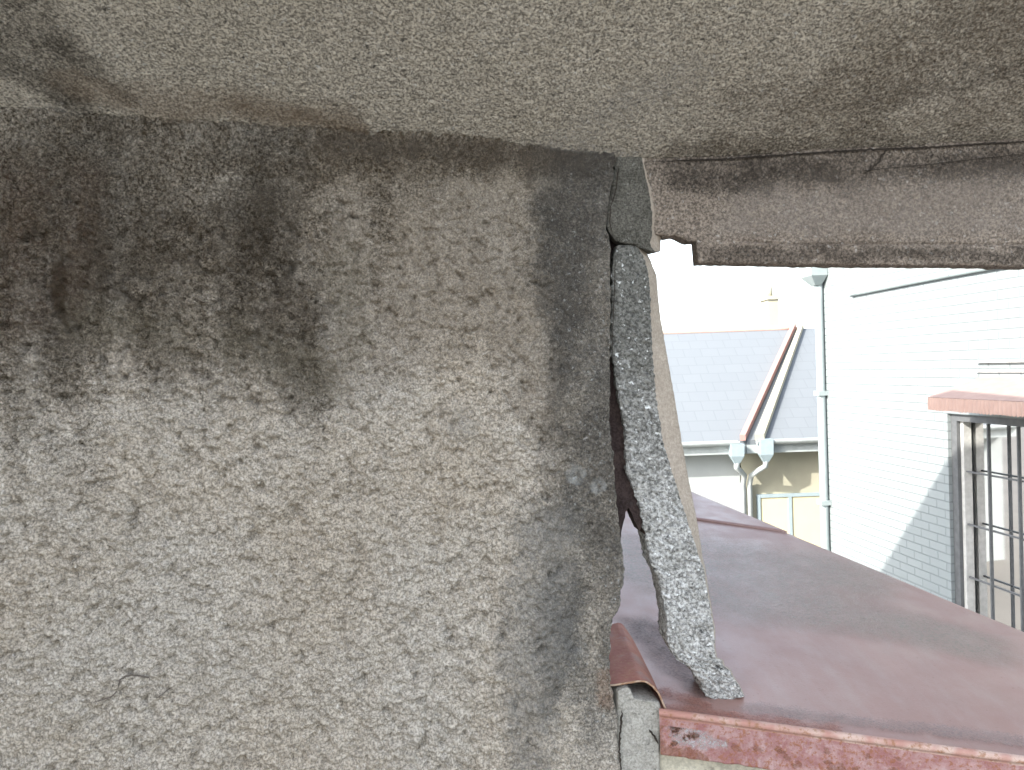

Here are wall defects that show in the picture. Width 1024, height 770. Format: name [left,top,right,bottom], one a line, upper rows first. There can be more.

crack [652,141,1024,172]
leakage [0,0,625,751]
rust [656,688,838,731]